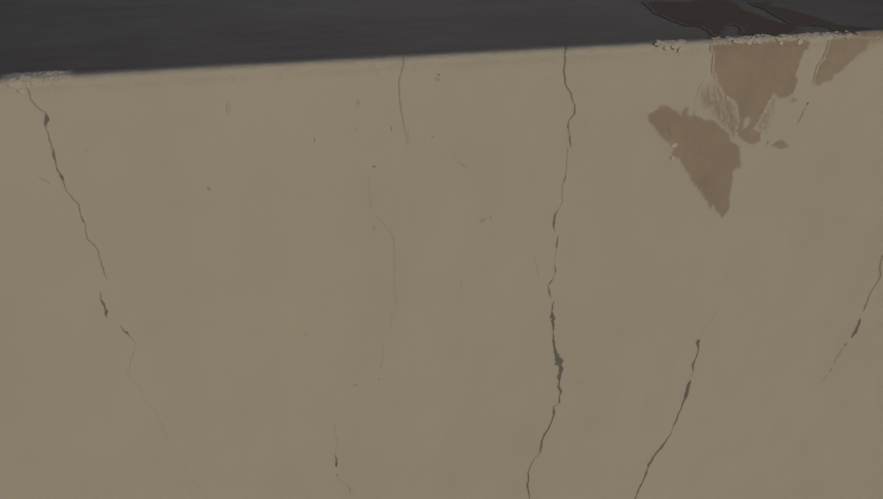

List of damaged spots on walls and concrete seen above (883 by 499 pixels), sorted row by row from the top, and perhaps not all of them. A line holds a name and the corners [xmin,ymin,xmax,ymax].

peeling [641,0,883,220]
crack [21,69,208,499]
crack [526,44,576,499]
crack [634,306,720,499]
crack [822,255,883,382]